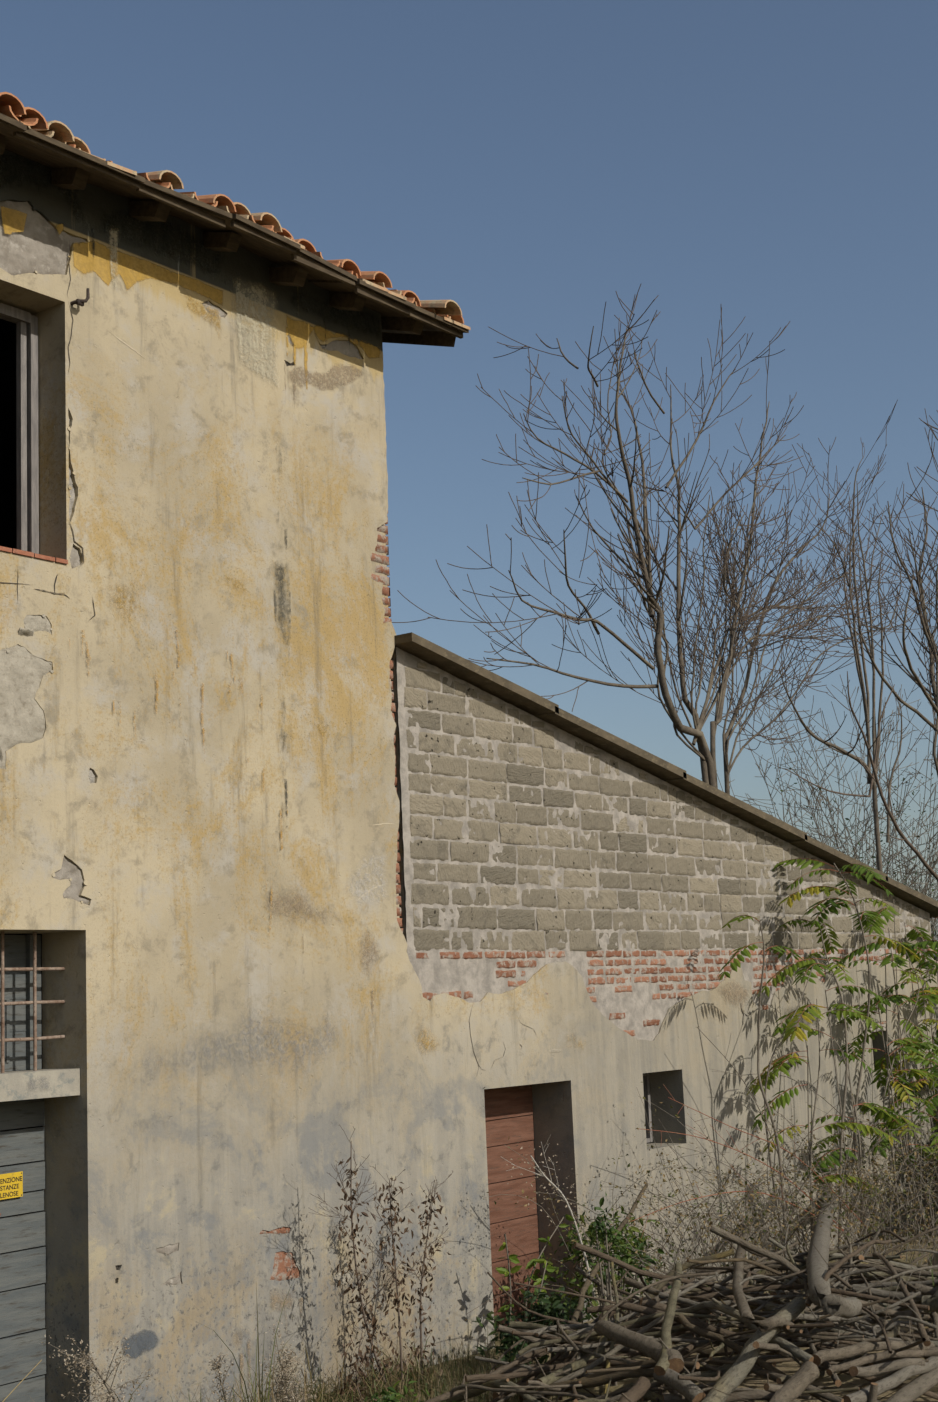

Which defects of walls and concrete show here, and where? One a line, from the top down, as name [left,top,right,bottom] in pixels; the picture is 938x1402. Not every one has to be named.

flaking render [0,201,226,317]
crack [66,243,74,374]
peeling [285,317,380,388]
leakage [274,566,291,622]
flaking render [0,614,54,769]
flaking render [52,857,89,905]
crack [469,1005,536,1088]
flaking render [269,1251,299,1281]